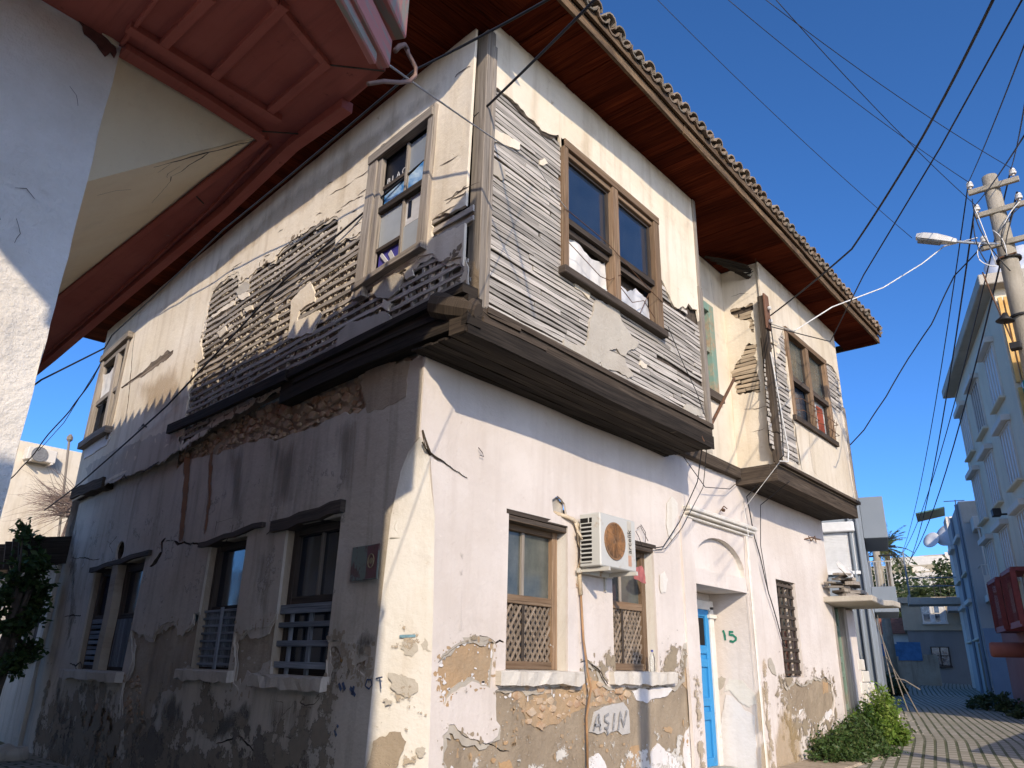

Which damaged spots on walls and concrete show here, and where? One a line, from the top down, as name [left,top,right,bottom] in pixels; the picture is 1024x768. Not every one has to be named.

spalling [496,88,559,139]
crack [154,139,255,200]
flaking render [432,205,475,239]
flaking render [84,216,479,485]
flaking render [730,303,799,464]
corrosion [179,456,190,541]
corrosion [204,452,213,533]
crack [422,430,467,478]
crack [149,518,233,568]
flaking render [366,728,426,768]
flaking render [391,626,706,768]
flaking render [718,651,840,768]